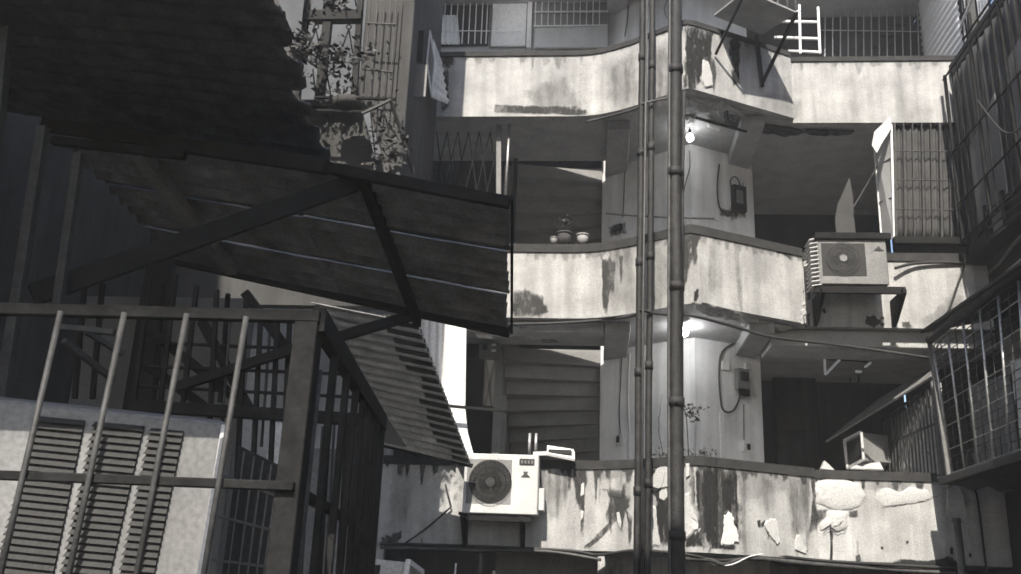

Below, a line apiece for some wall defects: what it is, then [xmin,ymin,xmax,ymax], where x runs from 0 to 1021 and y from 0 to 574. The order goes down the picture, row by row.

damp [684,25,717,99]
damp [729,39,740,85]
damp [561,468,633,547]
damp [651,467,668,544]
peeling [721,511,739,546]
damp [686,465,826,551]
damp [848,480,902,490]